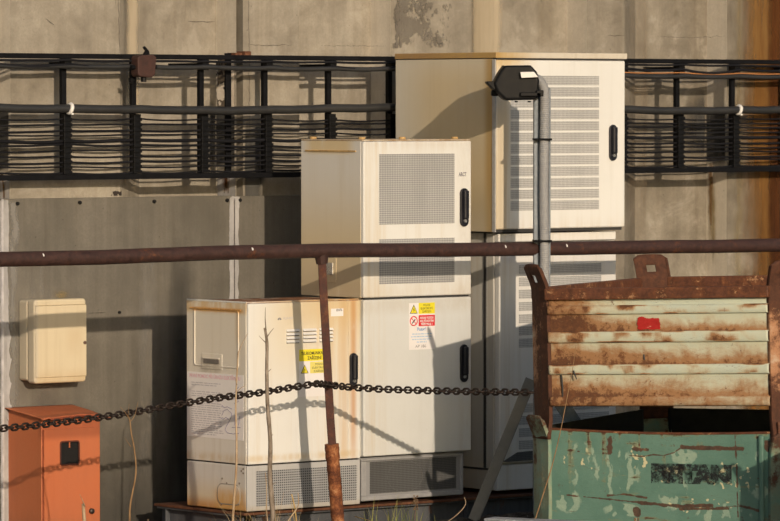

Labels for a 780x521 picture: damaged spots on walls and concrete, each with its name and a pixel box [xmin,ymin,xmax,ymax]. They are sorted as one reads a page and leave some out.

peeling [393,0,451,48]
corrosion [748,0,780,239]